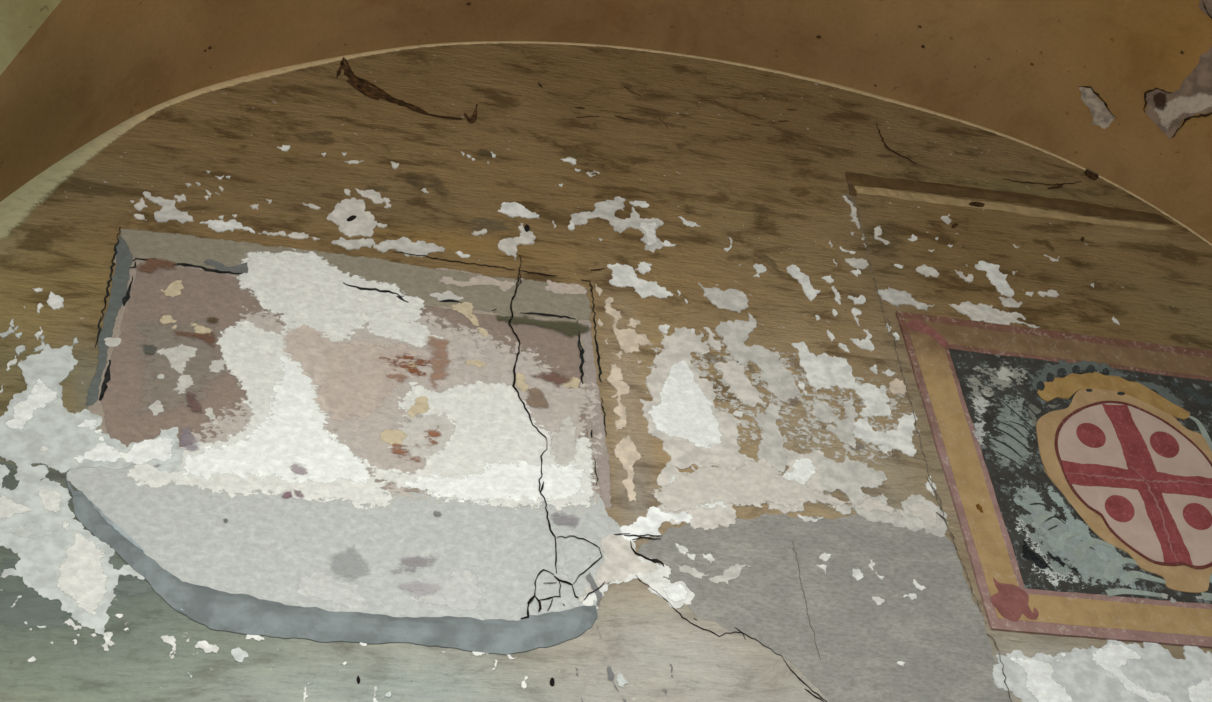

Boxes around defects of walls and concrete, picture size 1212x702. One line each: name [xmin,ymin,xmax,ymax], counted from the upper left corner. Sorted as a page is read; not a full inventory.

spalling [1079,86,1115,129]
spalling [1143,47,1212,139]
peeling [561,157,600,177]
peeling [0,170,1059,652]
crack [393,251,827,702]
peeling [160,634,264,663]
peeling [616,673,629,688]
peeling [992,639,1212,702]